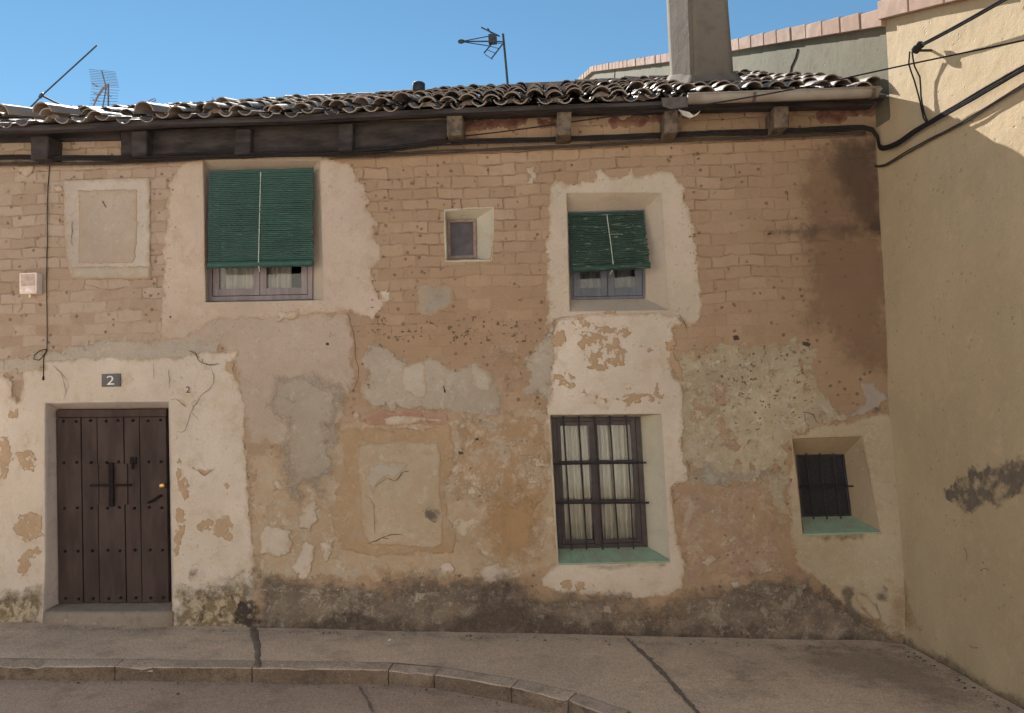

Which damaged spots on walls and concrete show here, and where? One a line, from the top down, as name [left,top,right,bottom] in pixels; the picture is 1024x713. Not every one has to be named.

leakage [805,152,888,367]
peeling [551,311,653,371]
peeling [0,437,37,479]
crack [153,350,216,432]
peeling [186,309,557,552]
peeling [553,372,664,407]
peeling [698,337,814,474]
peeling [12,512,44,577]
peeling [173,459,234,556]
crack [368,471,408,544]
leakage [0,586,42,623]
leakage [175,567,1024,710]